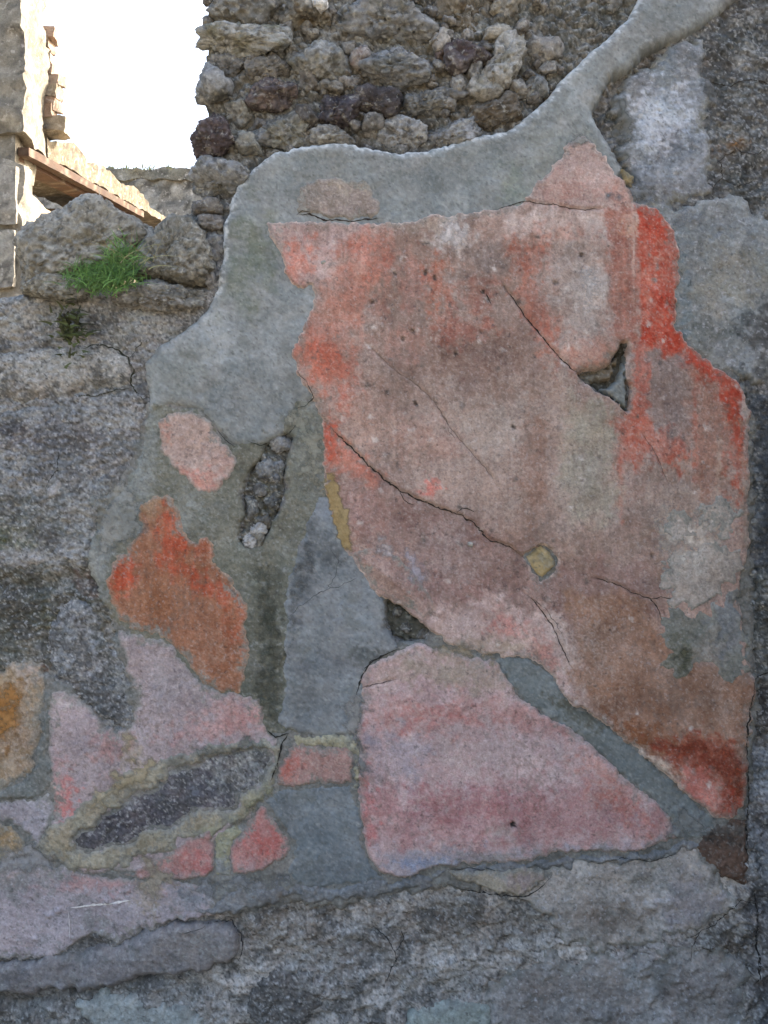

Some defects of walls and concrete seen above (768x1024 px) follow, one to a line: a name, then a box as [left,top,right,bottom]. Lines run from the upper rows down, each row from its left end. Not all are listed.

crack [494,201,594,211]
crack [74,342,142,398]
crack [486,291,586,384]
spalling [578,343,628,411]
spalling [47,480,62,498]
spalling [237,435,291,549]
crack [218,372,522,557]
spalling [386,600,429,641]
crack [530,597,570,665]
crack [596,578,670,620]
flaking render [449,841,751,1024]